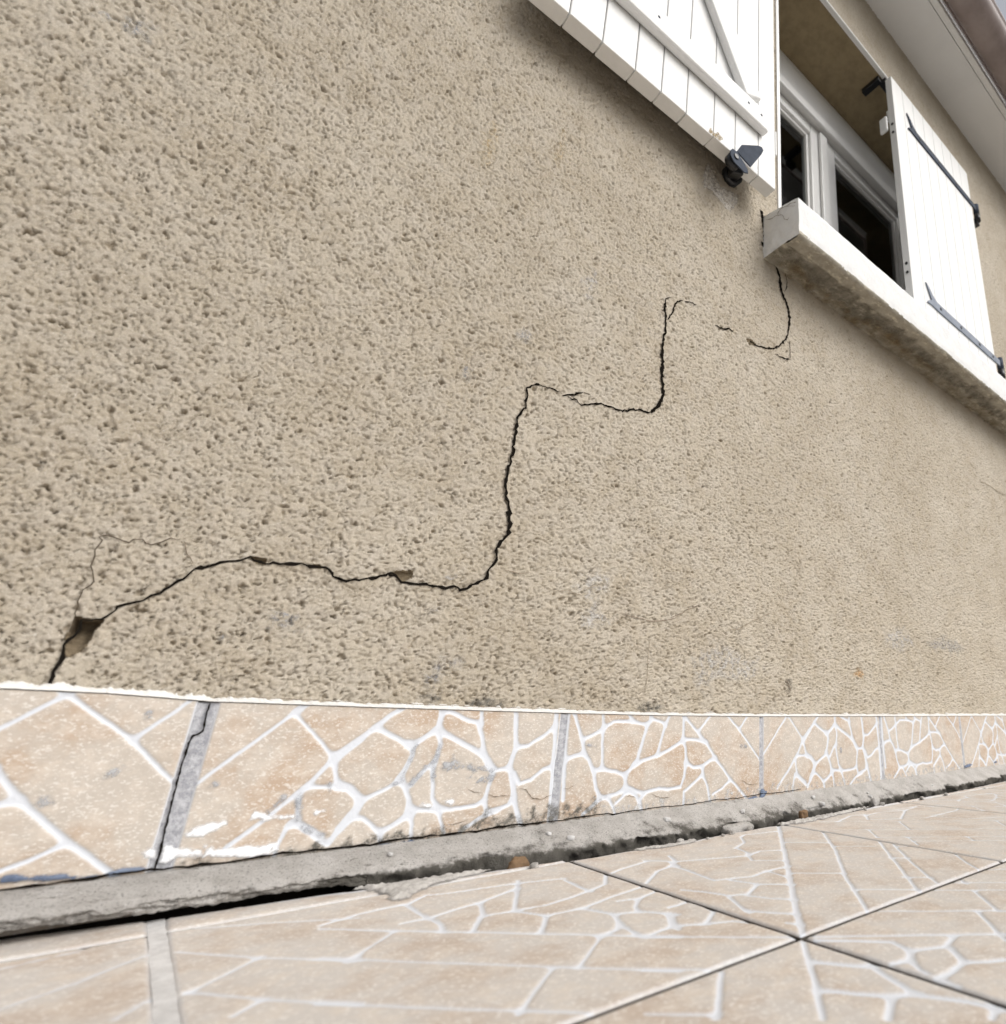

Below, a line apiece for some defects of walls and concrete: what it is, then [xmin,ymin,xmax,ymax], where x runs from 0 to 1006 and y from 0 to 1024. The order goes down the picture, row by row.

crack [716,202,795,360]
crack [48,297,696,684]
peeling [0,867,145,883]
crack [0,605,800,891]